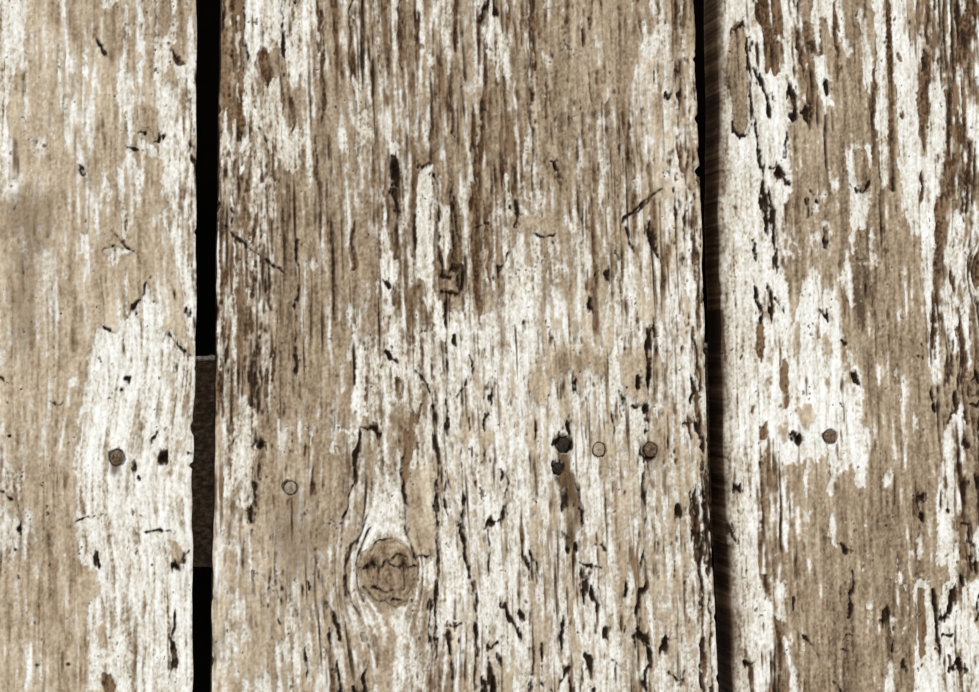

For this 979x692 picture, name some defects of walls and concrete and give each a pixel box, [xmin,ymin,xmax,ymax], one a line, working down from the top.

peeling [0,0,28,184]
peeling [220,0,316,221]
peeling [342,75,374,158]
peeling [390,141,399,157]
peeling [439,0,451,75]
peeling [476,0,512,90]
peeling [639,0,685,108]
peeling [73,0,196,692]
peeling [218,236,256,360]
peeling [721,0,979,692]
peeling [223,358,272,509]
peeling [329,164,717,692]